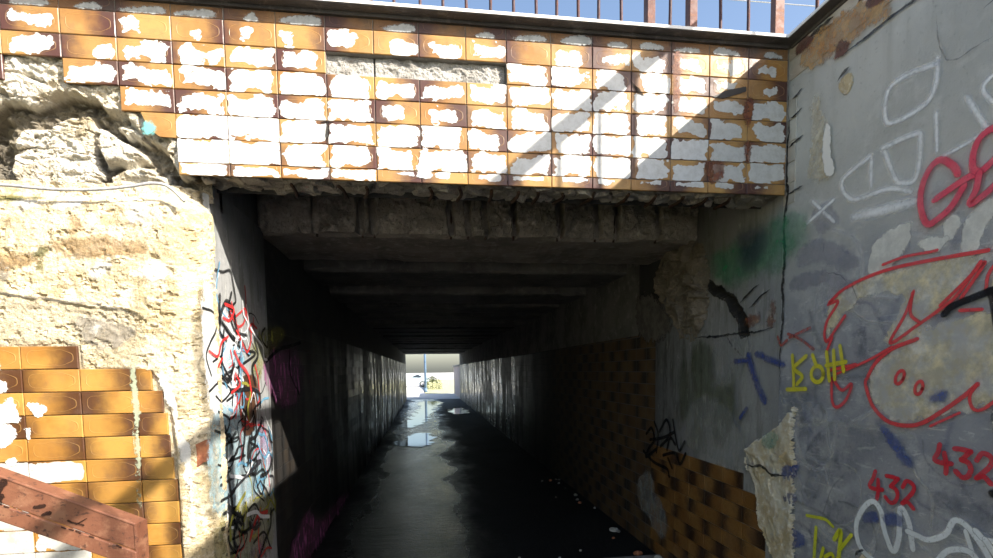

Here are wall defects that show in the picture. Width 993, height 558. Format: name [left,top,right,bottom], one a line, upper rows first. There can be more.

spalling [0,8,786,210]
peeling [89,260,112,278]
peeling [138,260,167,282]
crack [697,88,803,390]
peeling [0,380,84,508]
peeling [0,521,92,558]
flaking render [744,406,798,558]